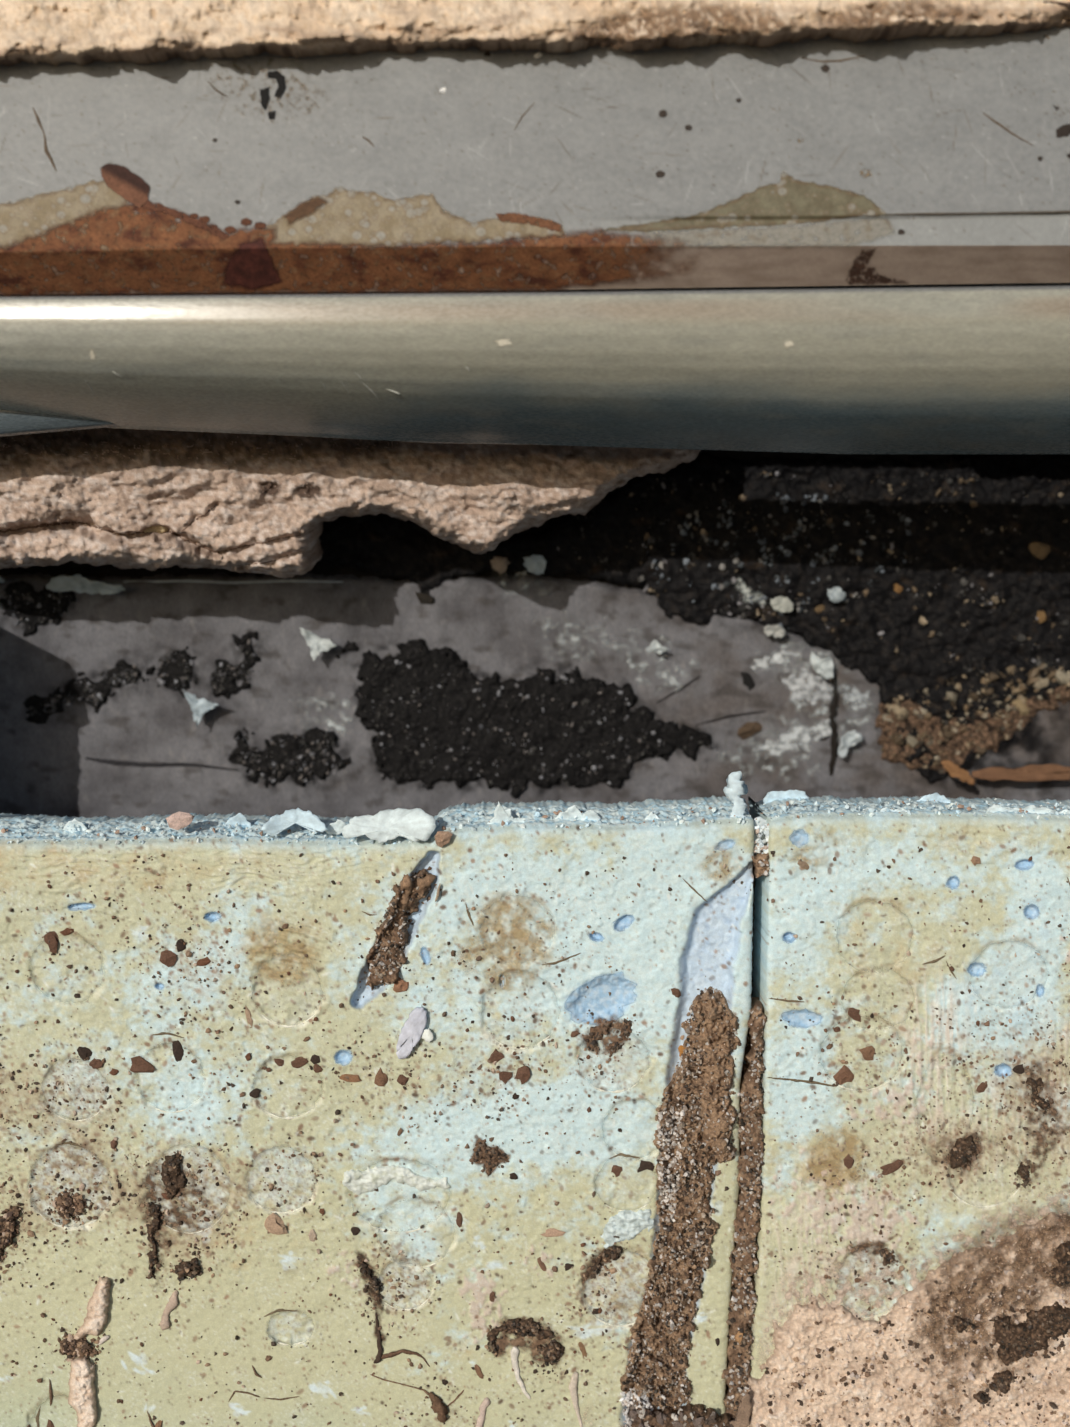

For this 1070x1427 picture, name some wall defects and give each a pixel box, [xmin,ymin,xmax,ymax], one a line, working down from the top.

rust [0,163,664,296]
peeling [0,574,125,637]
peeling [764,596,794,638]
peeling [827,587,846,603]
peeling [23,631,261,728]
peeling [810,651,834,679]
peeling [227,727,352,788]
peeling [300,628,712,824]
peeling [838,730,863,758]
peeling [723,771,809,818]
peeling [224,808,436,843]
crack [609,816,835,1427]